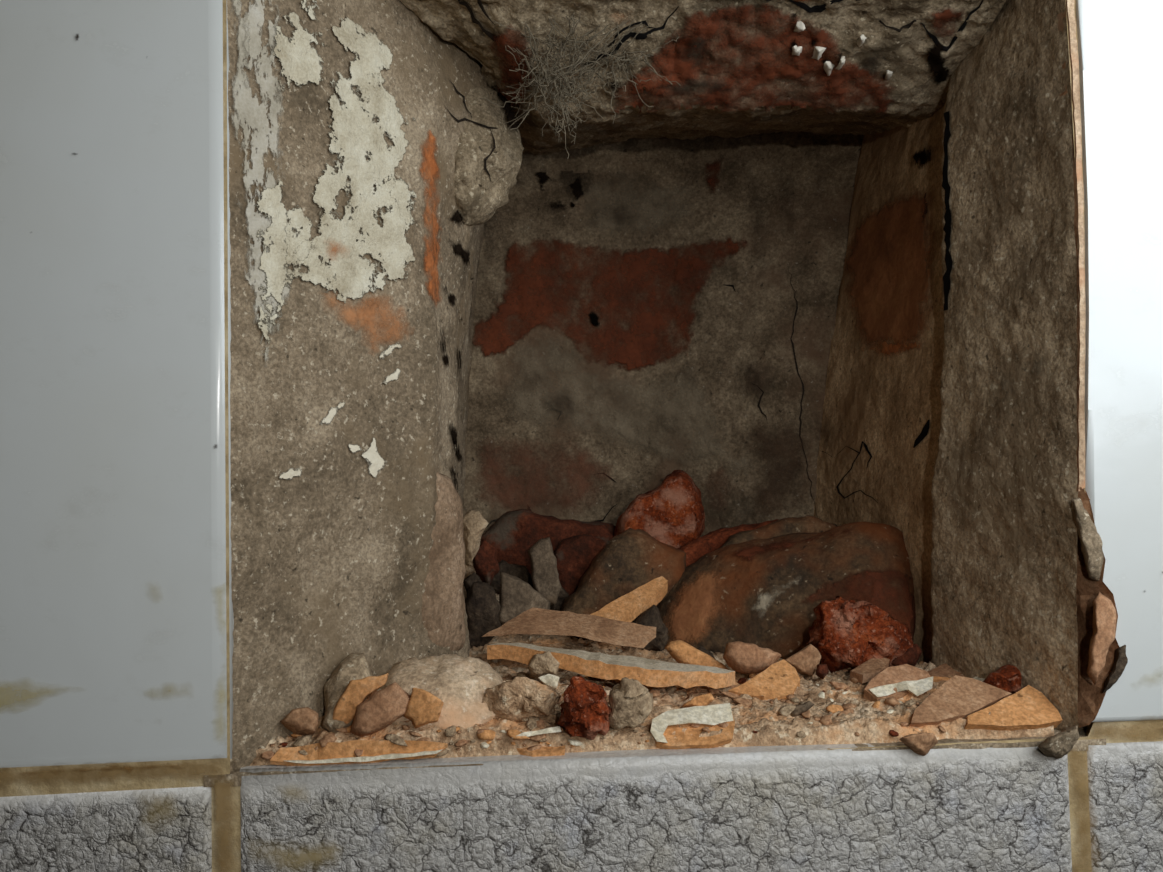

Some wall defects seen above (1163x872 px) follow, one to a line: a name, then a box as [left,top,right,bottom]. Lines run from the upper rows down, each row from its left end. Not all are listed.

crack [585,6,679,65]
spalling [615,4,894,114]
crack [767,0,859,13]
crack [879,0,983,52]
peeling [231,0,473,360]
crack [444,81,504,181]
crack [923,111,953,311]
spalling [473,238,746,371]
peeling [279,468,302,480]
peeling [349,437,387,478]
crack [913,420,930,448]
spalling [1071,487,1128,728]